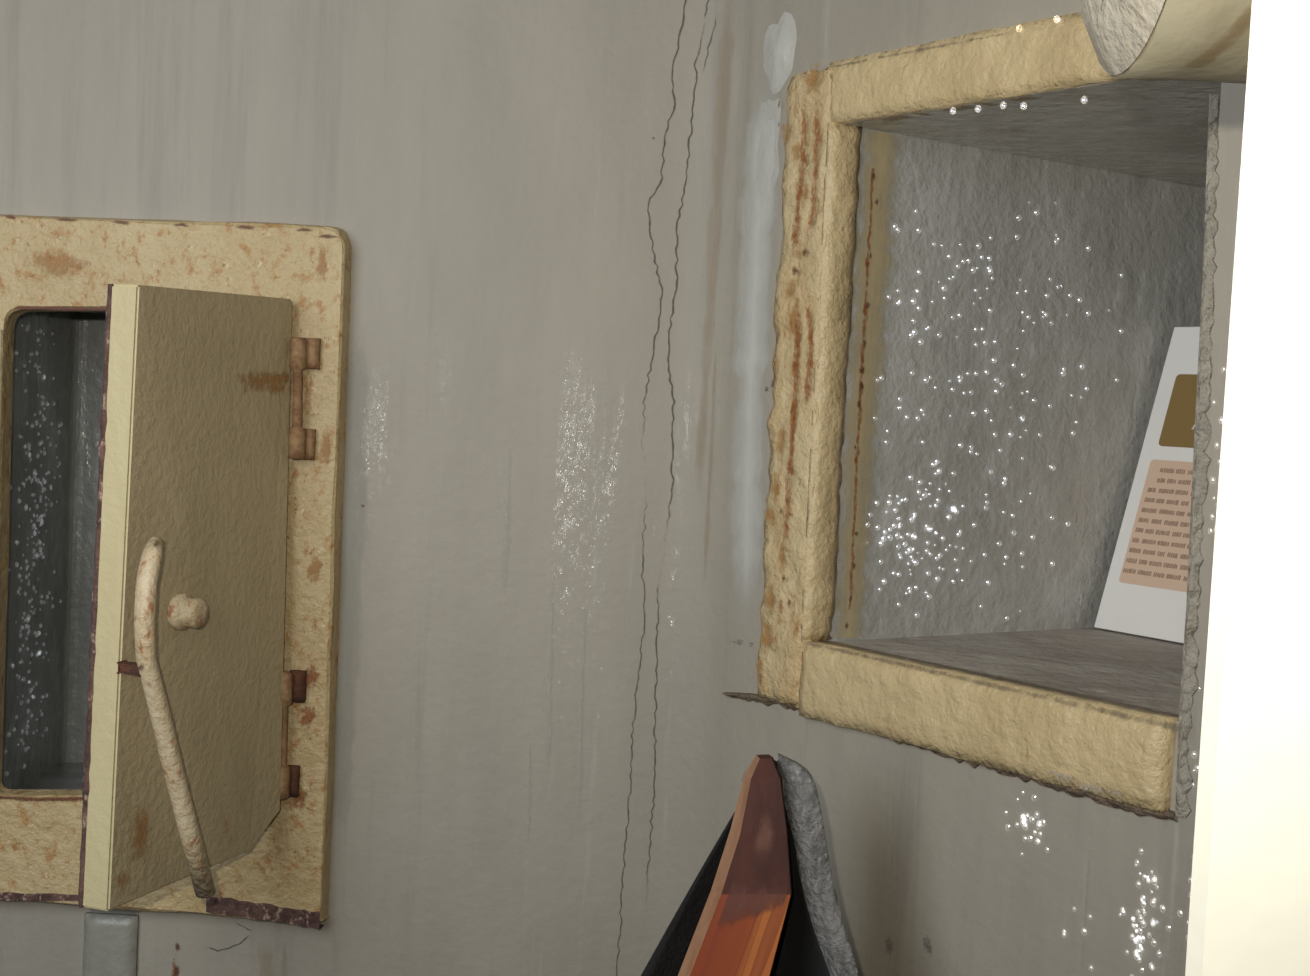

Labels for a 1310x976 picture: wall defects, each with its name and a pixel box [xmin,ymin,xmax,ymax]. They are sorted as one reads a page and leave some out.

crack [616,0,716,976]
corrosion [764,110,820,607]
corrosion [845,168,878,628]